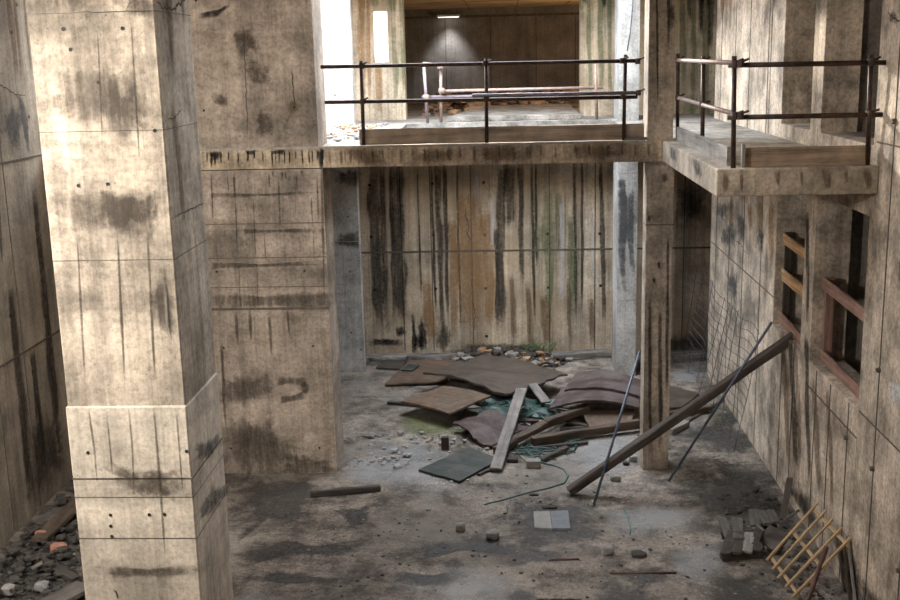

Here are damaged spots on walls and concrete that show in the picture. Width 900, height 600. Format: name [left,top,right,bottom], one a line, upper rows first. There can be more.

damp [687,0,714,45]
damp [73,195,151,234]
damp [147,249,171,361]
damp [339,151,408,322]
damp [430,170,461,349]
damp [461,344,529,352]
damp [489,149,537,322]
damp [560,164,606,312]
damp [678,185,705,221]